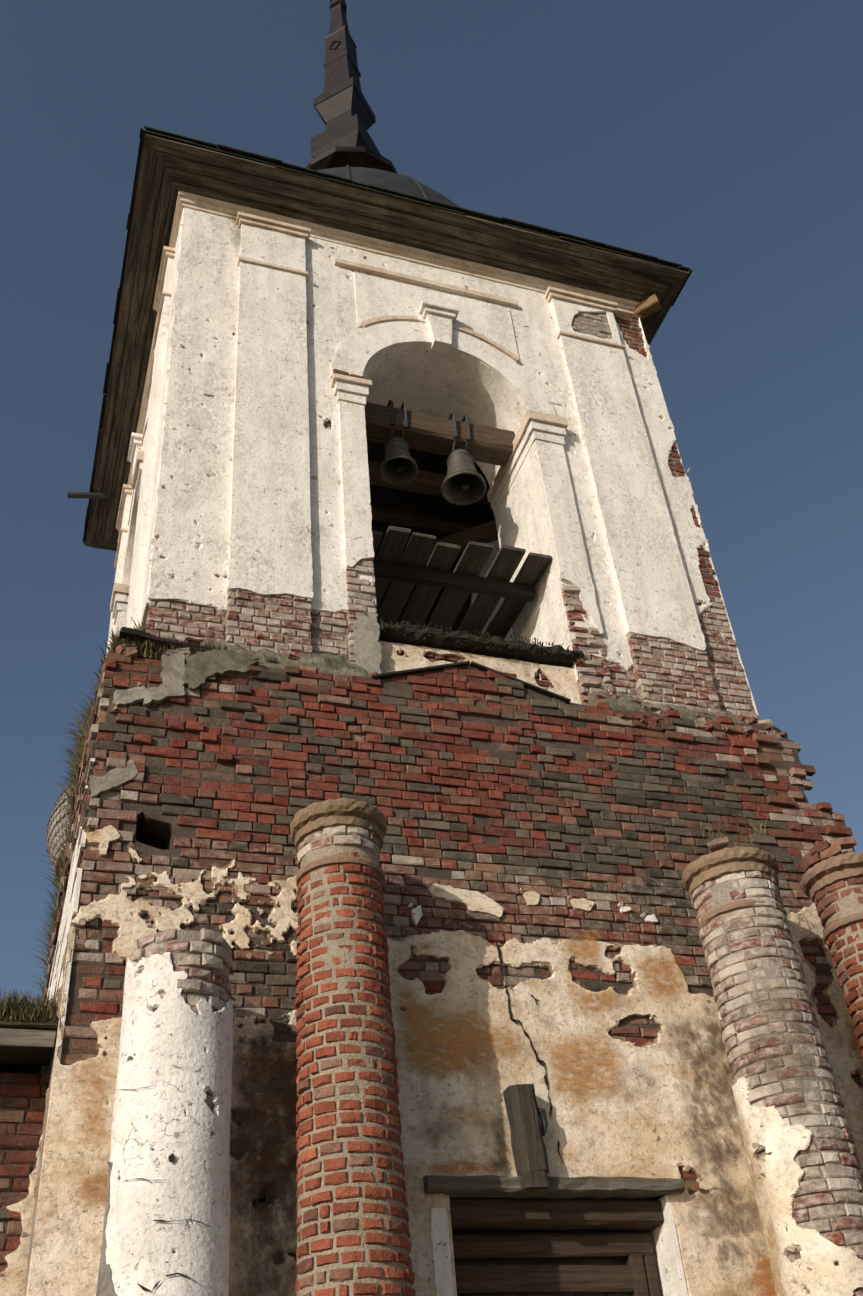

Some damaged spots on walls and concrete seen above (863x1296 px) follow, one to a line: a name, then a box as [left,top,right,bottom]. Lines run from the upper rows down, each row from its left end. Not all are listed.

spalling [571,310,647,358]
spalling [696,544,721,606]
spalling [132,872,298,1033]
spalling [476,962,550,990]
spalling [568,942,635,996]
crack [496,942,565,1168]
spalling [608,1014,661,1047]
leakage [230,1027,297,1295]
leakage [676,1021,758,1256]
spalling [0,1192,29,1276]
crack [153,1216,212,1227]
crack [137,1273,203,1296]